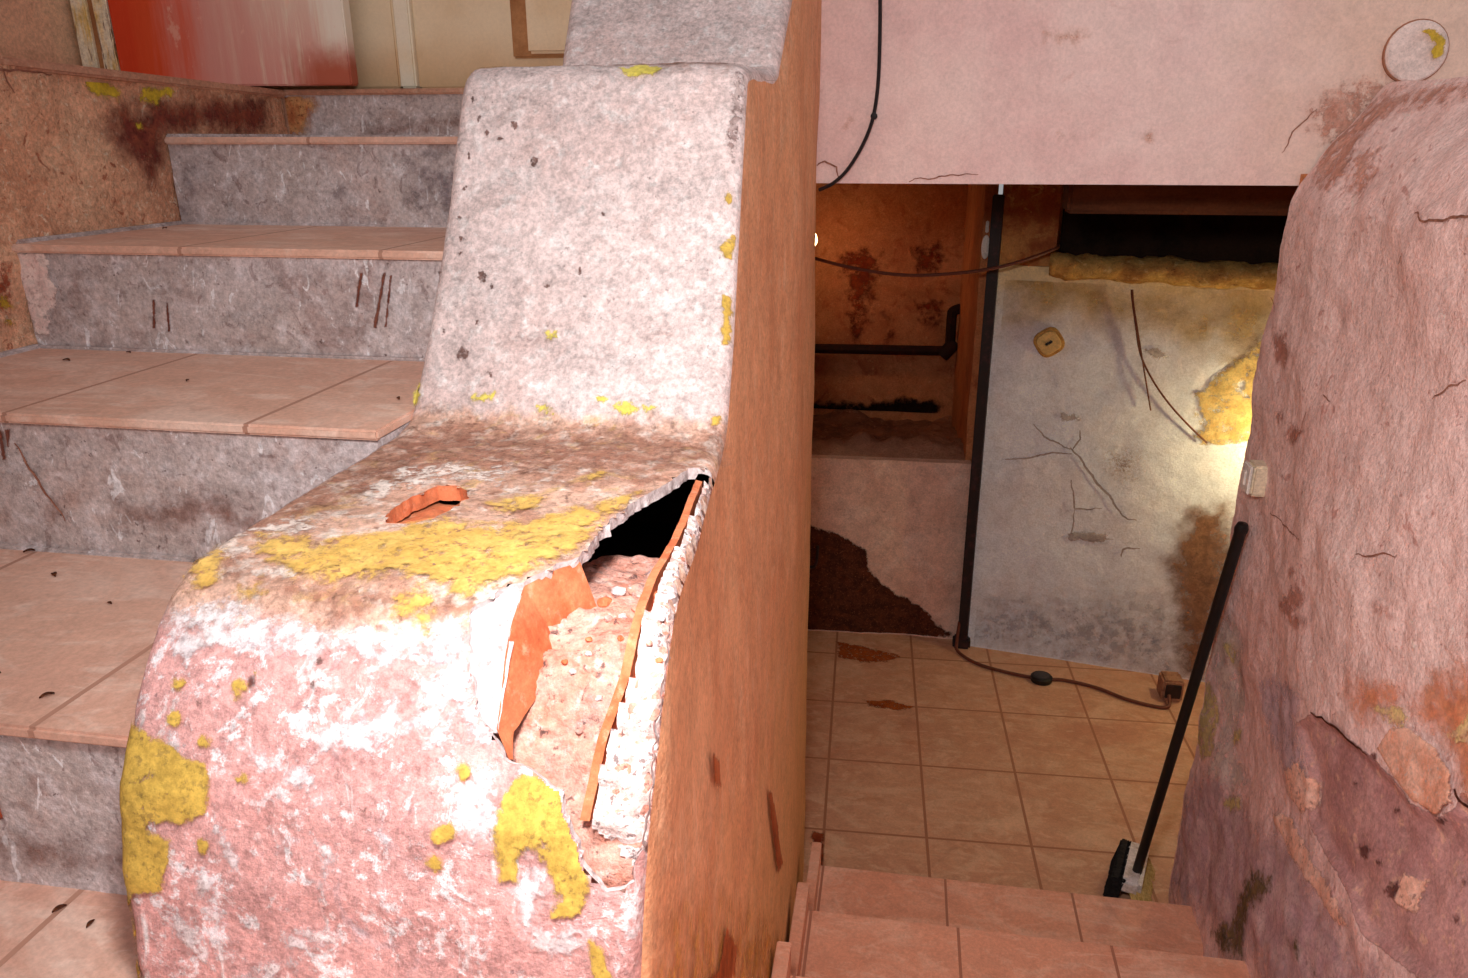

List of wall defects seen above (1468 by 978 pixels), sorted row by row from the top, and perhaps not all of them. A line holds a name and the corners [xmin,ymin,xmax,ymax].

crack [1414,211,1468,223]
damp [840,248,880,340]
corrosion [0,429,10,460]
crack [1005,424,1140,557]
flaking render [808,526,951,638]
damp [984,506,1230,672]
spalling [172,462,712,893]
corrosion [838,642,900,663]
corrosion [866,700,913,710]
crack [1310,712,1367,755]
flaking render [1273,714,1468,978]
peeling [506,866,594,956]